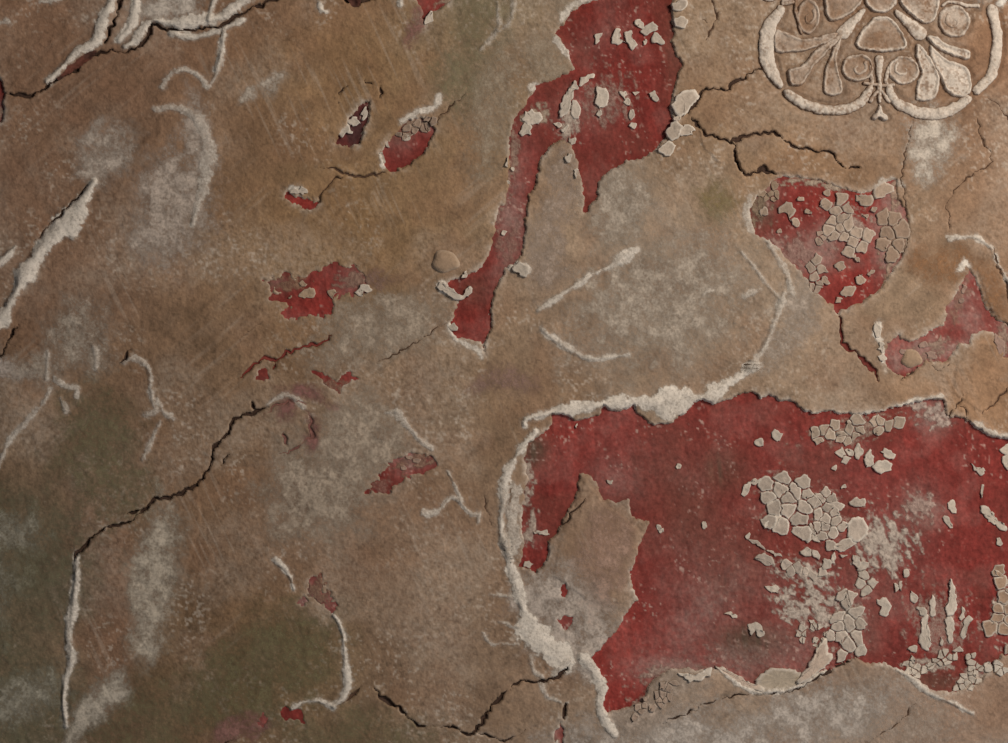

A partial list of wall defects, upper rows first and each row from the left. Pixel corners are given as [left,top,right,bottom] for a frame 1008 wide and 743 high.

crack [9,0,278,98]
peeling [436,0,700,359]
crack [688,68,860,176]
efflorescence [0,300,107,386]
crack [240,335,332,378]
peeling [262,262,372,320]
peeling [743,176,911,313]
peeling [873,259,1008,377]
crack [74,399,315,560]
peeling [498,292,1008,738]
leakage [509,513,632,681]
crack [339,667,568,742]